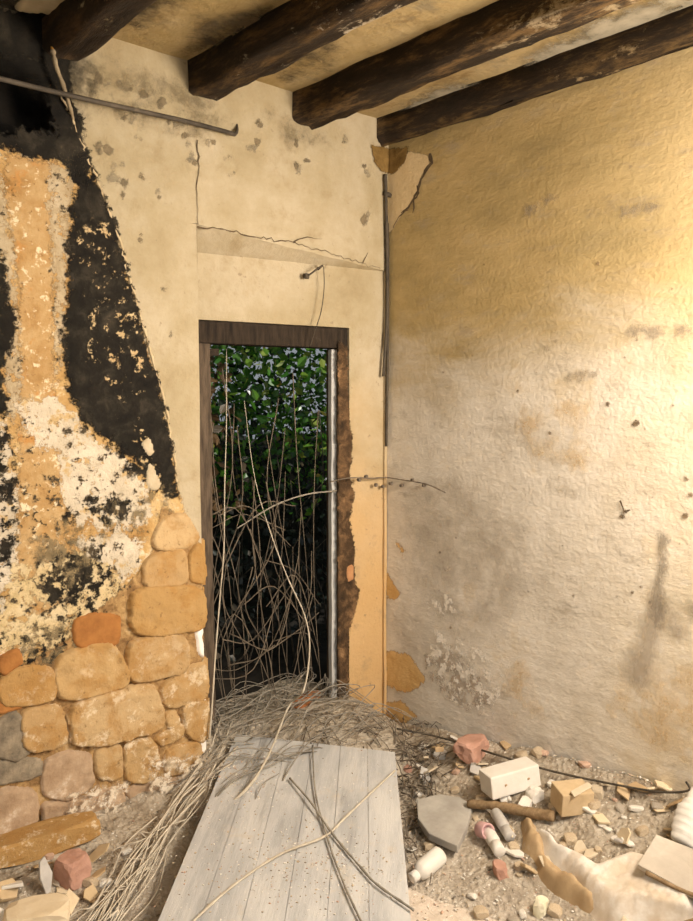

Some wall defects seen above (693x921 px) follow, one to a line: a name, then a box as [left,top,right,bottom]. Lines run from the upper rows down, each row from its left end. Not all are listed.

peeling [90,71,166,109]
peeling [167,120,197,166]
crack [196,140,379,268]
peeling [363,145,429,232]
damp [0,0,180,499]
flaking render [0,96,185,665]
flaking render [337,341,360,687]
peeling [387,573,400,600]
damp [653,534,668,623]
peeling [386,627,503,723]
damp [425,651,489,706]